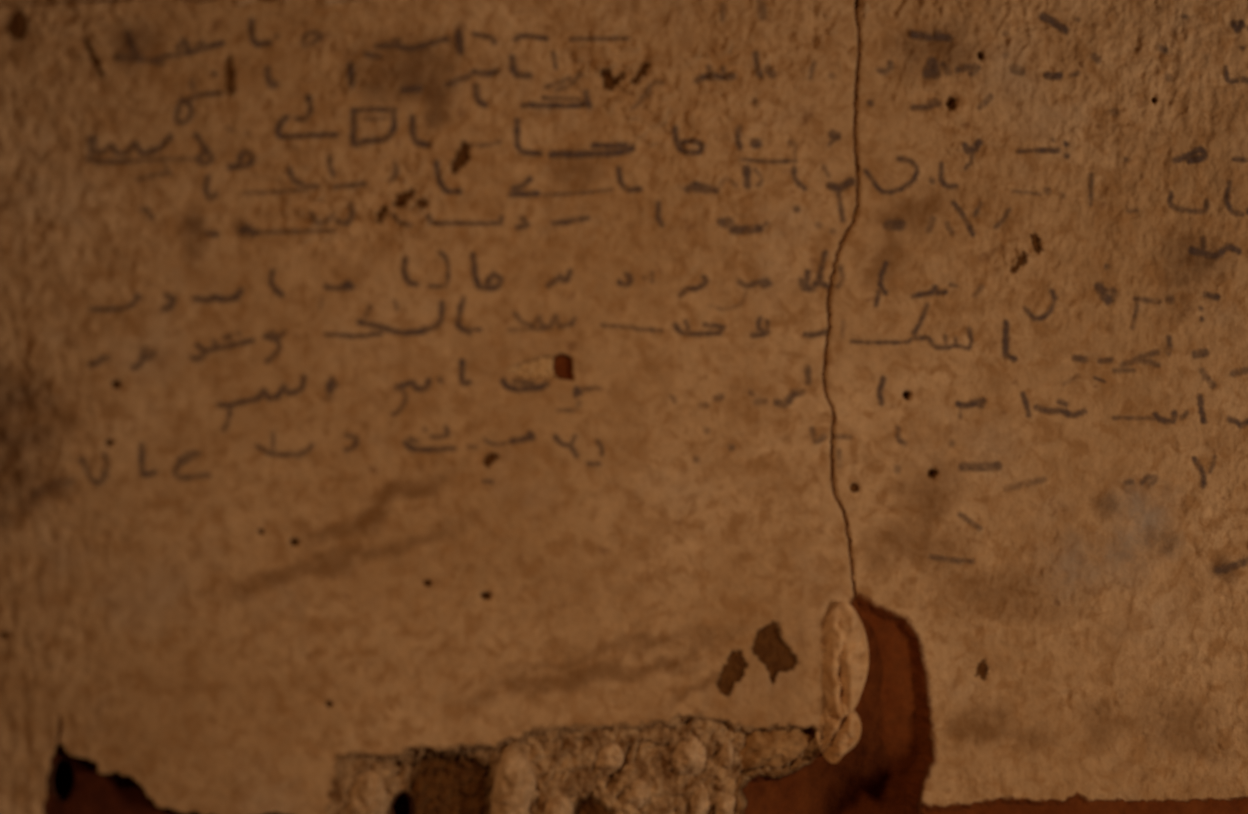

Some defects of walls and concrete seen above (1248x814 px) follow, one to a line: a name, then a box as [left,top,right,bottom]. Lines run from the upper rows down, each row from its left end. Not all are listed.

crack [822,0,861,598]
flaking render [43,745,197,814]
flaking render [327,594,1248,814]